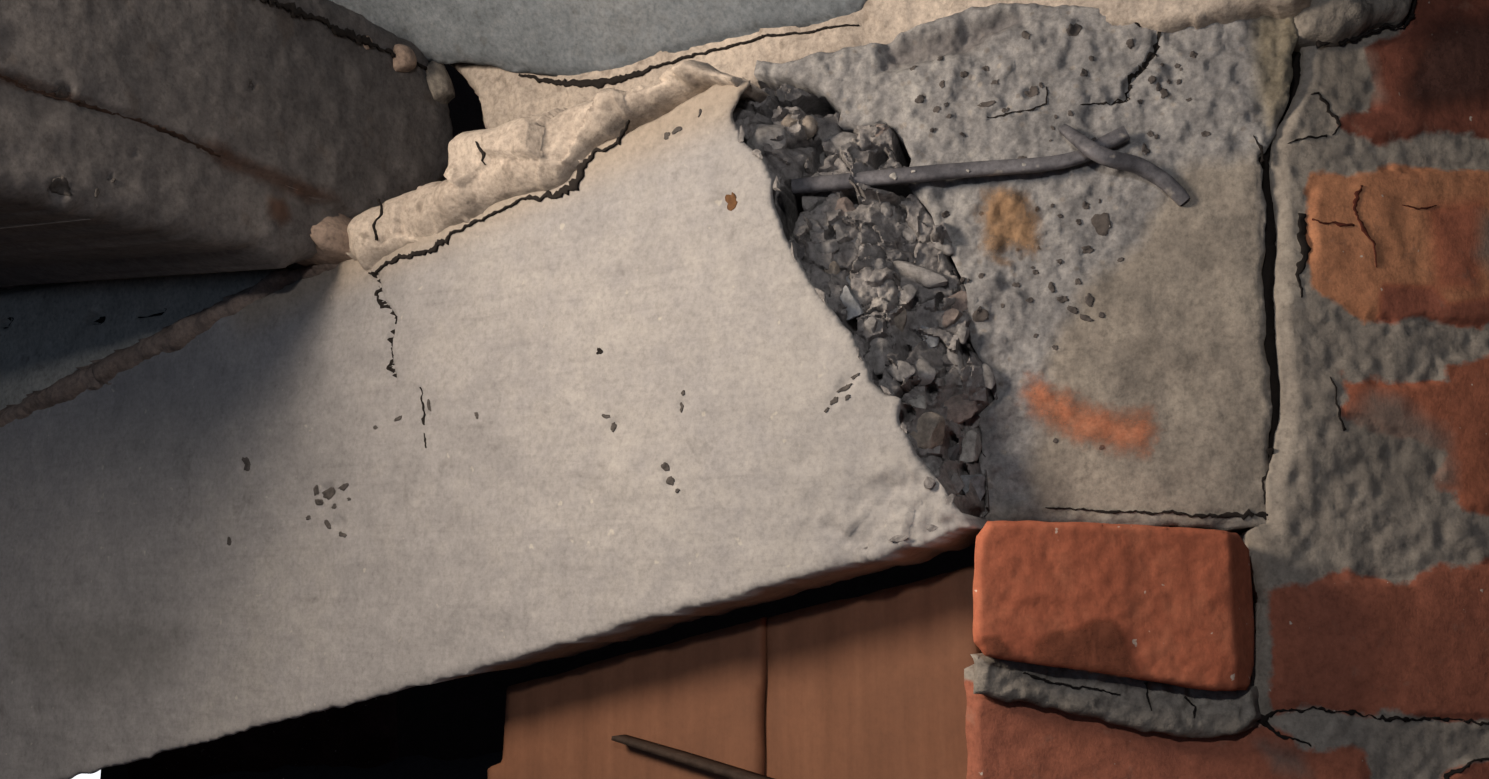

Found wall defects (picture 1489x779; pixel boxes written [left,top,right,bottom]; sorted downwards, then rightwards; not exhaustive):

crack [260,0,427,70]
crack [518,24,860,89]
spalling [915,66,1009,133]
crack [368,120,630,448]
spalling [725,192,737,211]
spalling [733,80,998,518]
rust [984,189,1036,262]
spalling [1012,246,1105,322]
spalling [1035,199,1111,254]
crack [1045,0,1417,520]
crack [1402,203,1436,211]
crack [1257,706,1489,779]